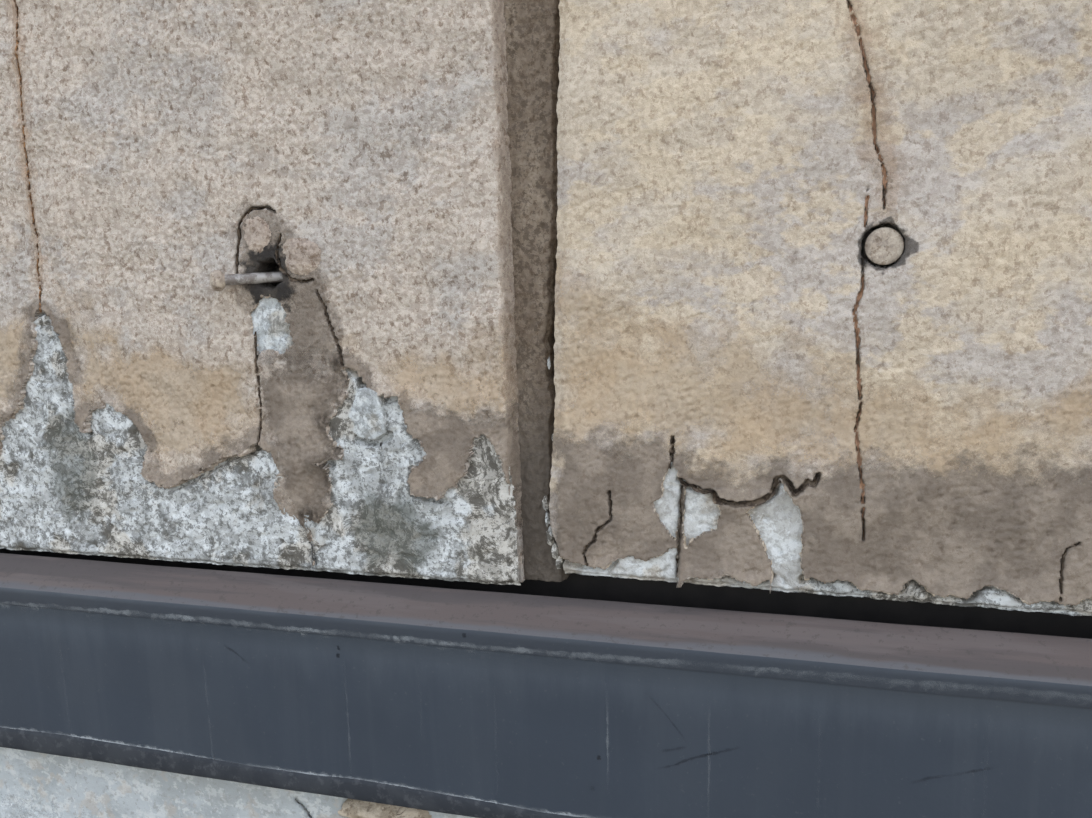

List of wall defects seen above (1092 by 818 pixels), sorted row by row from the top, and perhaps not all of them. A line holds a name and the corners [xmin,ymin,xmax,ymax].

crack [14,0,42,312]
crack [848,1,888,227]
crack [254,331,262,446]
spalling [0,313,521,585]
spalling [251,297,293,354]
crack [236,206,344,366]
crack [582,491,612,565]
crack [669,436,818,577]
spalling [542,462,1092,616]
crack [853,259,865,539]
crack [1060,543,1080,601]